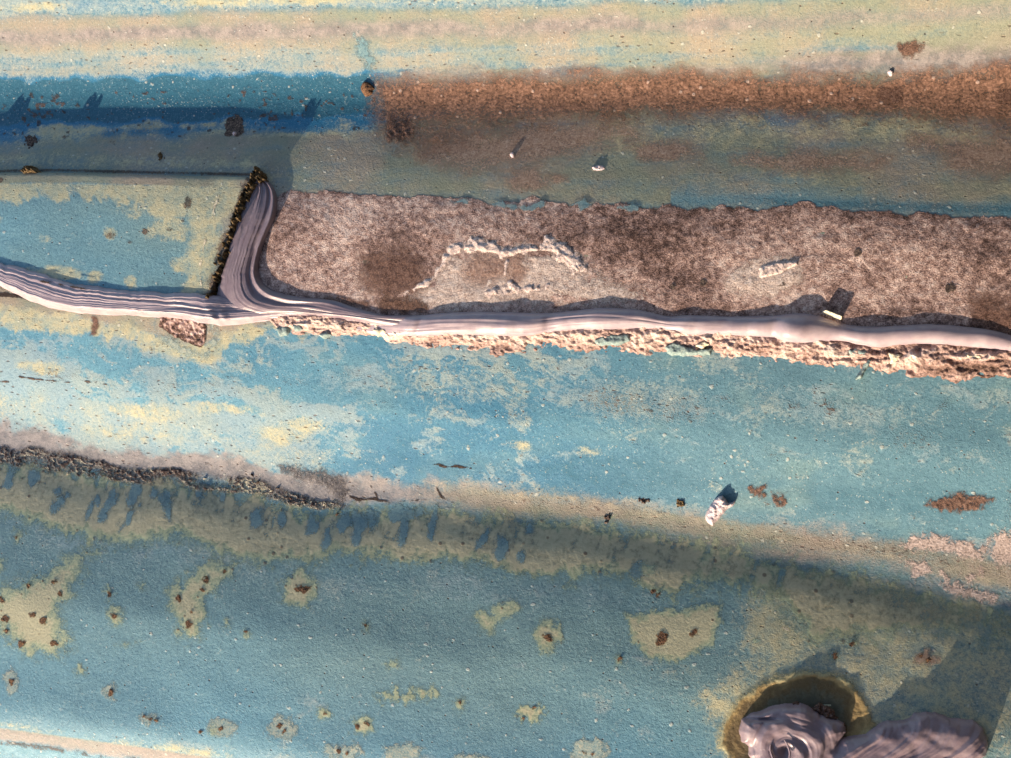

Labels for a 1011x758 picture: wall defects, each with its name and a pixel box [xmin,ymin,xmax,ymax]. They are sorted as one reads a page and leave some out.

rust [897,41,924,59]
rust [376,61,1011,190]
spalling [259,189,1011,384]
peeling [0,446,350,516]
rust [925,492,994,514]
peeling [0,549,102,657]
peeling [282,567,318,610]